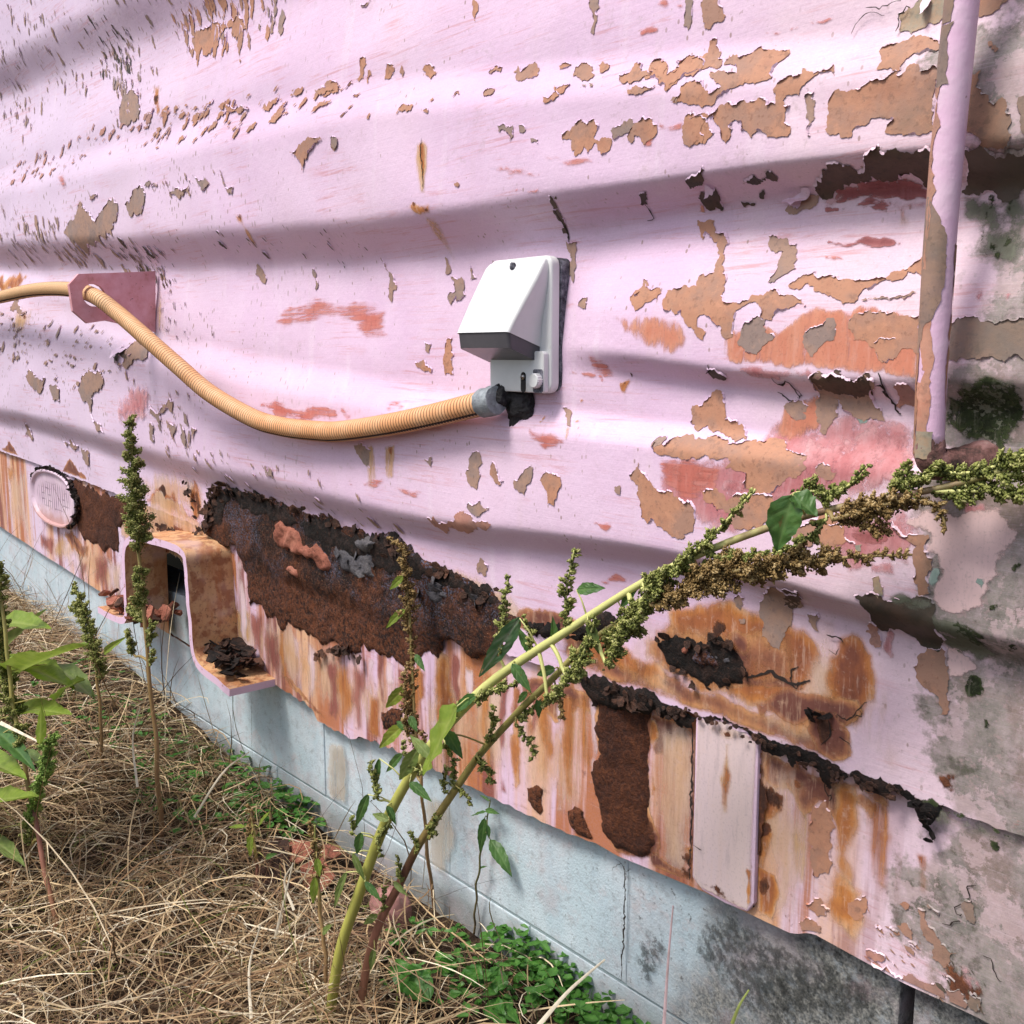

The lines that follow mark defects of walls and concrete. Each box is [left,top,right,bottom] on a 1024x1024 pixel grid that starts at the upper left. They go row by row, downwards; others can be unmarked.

peeling [0,0,371,185]
peeling [384,63,404,79]
peeling [422,63,436,79]
peeling [514,62,539,81]
peeling [543,0,944,215]
peeling [962,70,1024,202]
peeling [630,165,922,435]
corrosion [41,459,183,627]
peeling [614,365,837,539]
peeling [792,515,861,551]
corrosion [144,478,943,938]
peeling [847,885,985,1015]